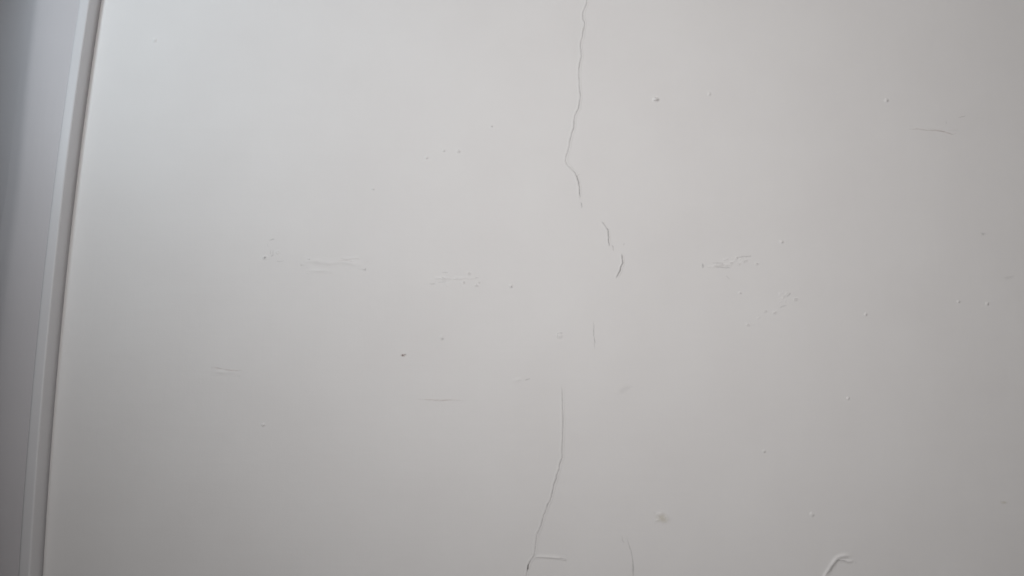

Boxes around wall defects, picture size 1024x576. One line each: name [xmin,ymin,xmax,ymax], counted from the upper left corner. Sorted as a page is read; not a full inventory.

crack [563,0,589,200]
crack [600,220,625,280]
crack [524,384,566,576]